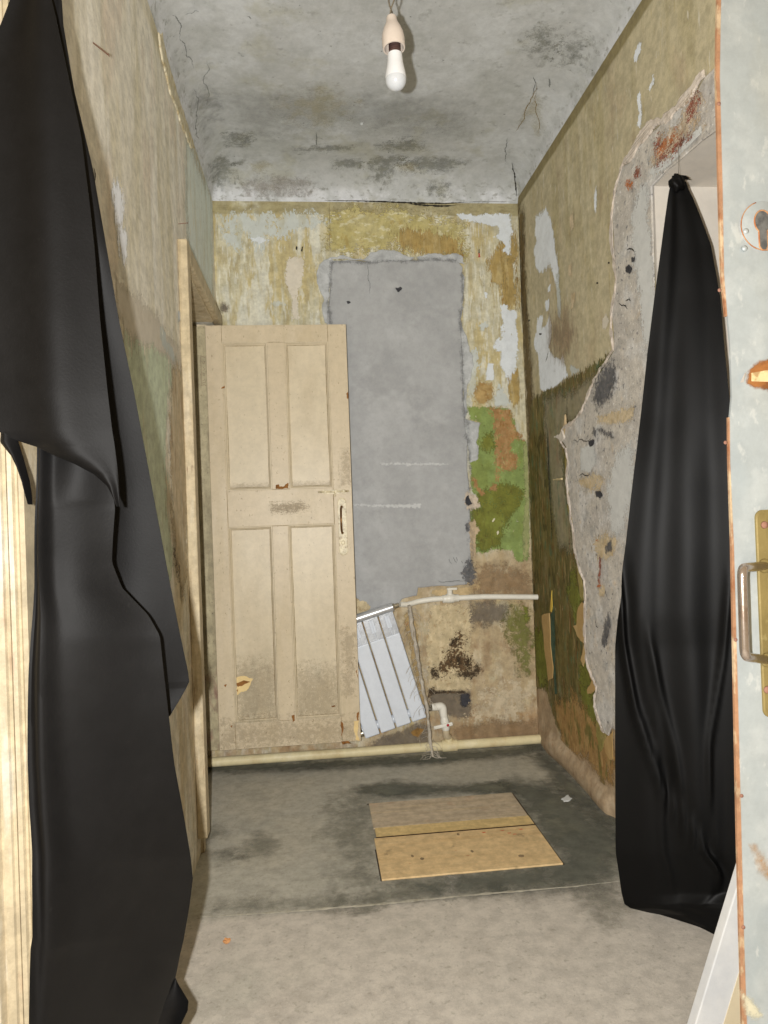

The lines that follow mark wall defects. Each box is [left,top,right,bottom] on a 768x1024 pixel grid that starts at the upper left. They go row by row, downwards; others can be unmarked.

crack [172,10,210,138]
peeling [270,256,306,320]
crack [326,77,551,242]
peeling [457,213,513,255]
peeling [534,208,579,392]
peeling [449,304,530,564]
spalling [553,68,716,760]
leakage [208,353,617,904]